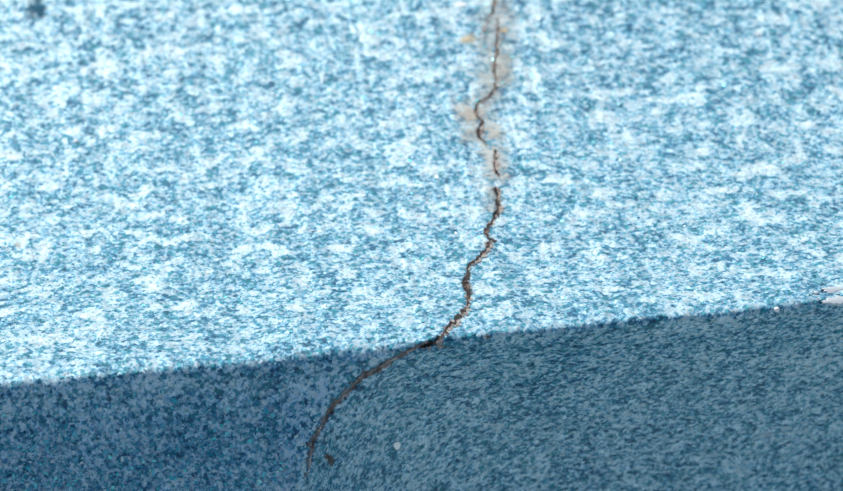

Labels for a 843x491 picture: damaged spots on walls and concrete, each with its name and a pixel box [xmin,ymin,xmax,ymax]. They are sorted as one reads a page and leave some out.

crack [305,0,504,476]